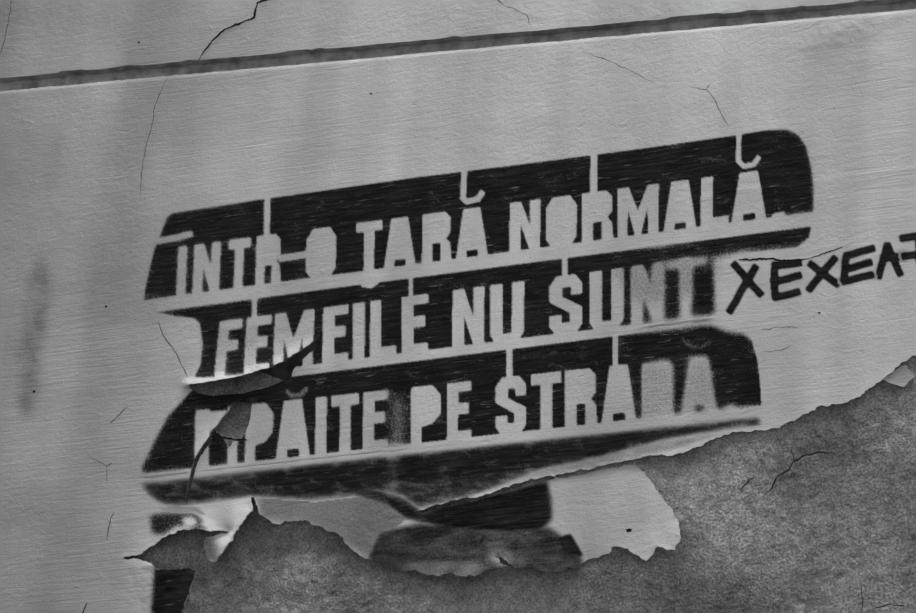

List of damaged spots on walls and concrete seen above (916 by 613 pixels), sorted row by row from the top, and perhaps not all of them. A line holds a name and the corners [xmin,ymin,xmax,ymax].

crack [197,0,267,62]
crack [140,84,164,194]
flaking render [178,321,323,499]
spalling [125,356,916,613]